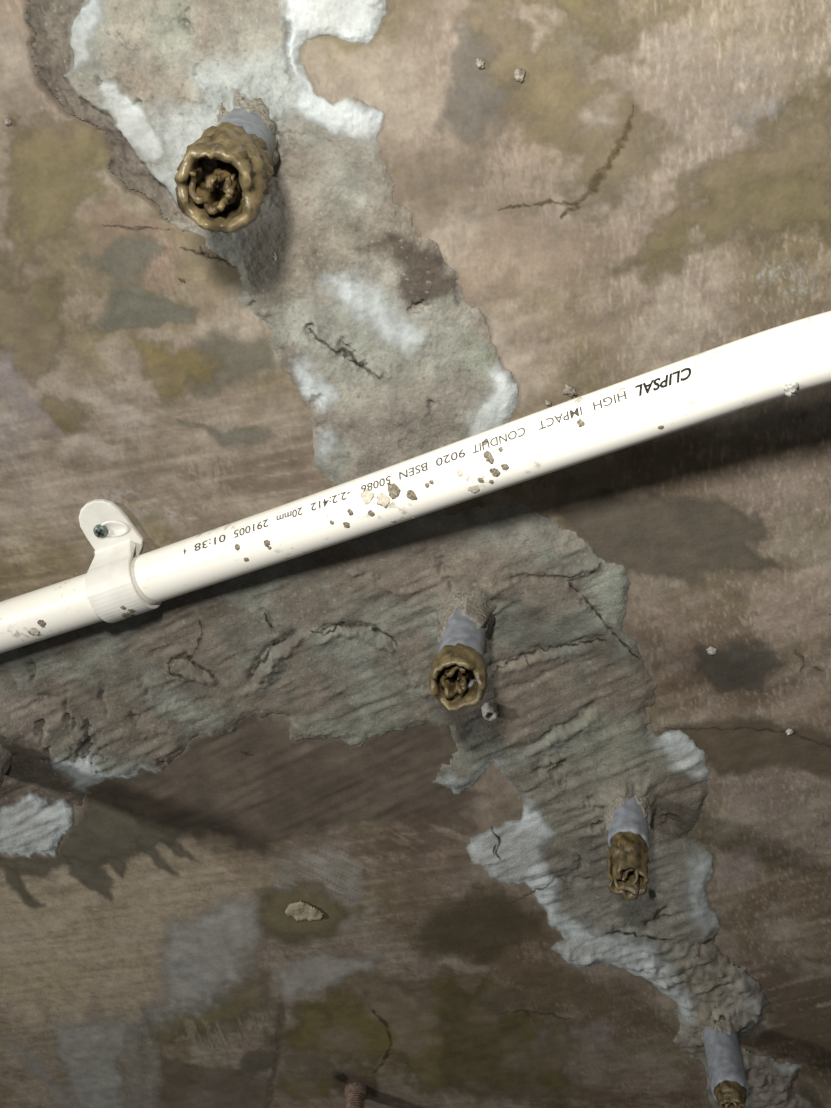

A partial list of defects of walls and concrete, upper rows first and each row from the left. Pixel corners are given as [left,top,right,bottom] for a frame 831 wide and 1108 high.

spalling [25,0,519,486]
damp [468,0,669,213]
damp [635,86,831,277]
damp [57,1022,136,1108]
damp [141,842,193,875]
peeling [158,1006,283,1108]
peeling [285,901,324,921]
damp [144,849,572,1108]
damp [467,806,693,1025]